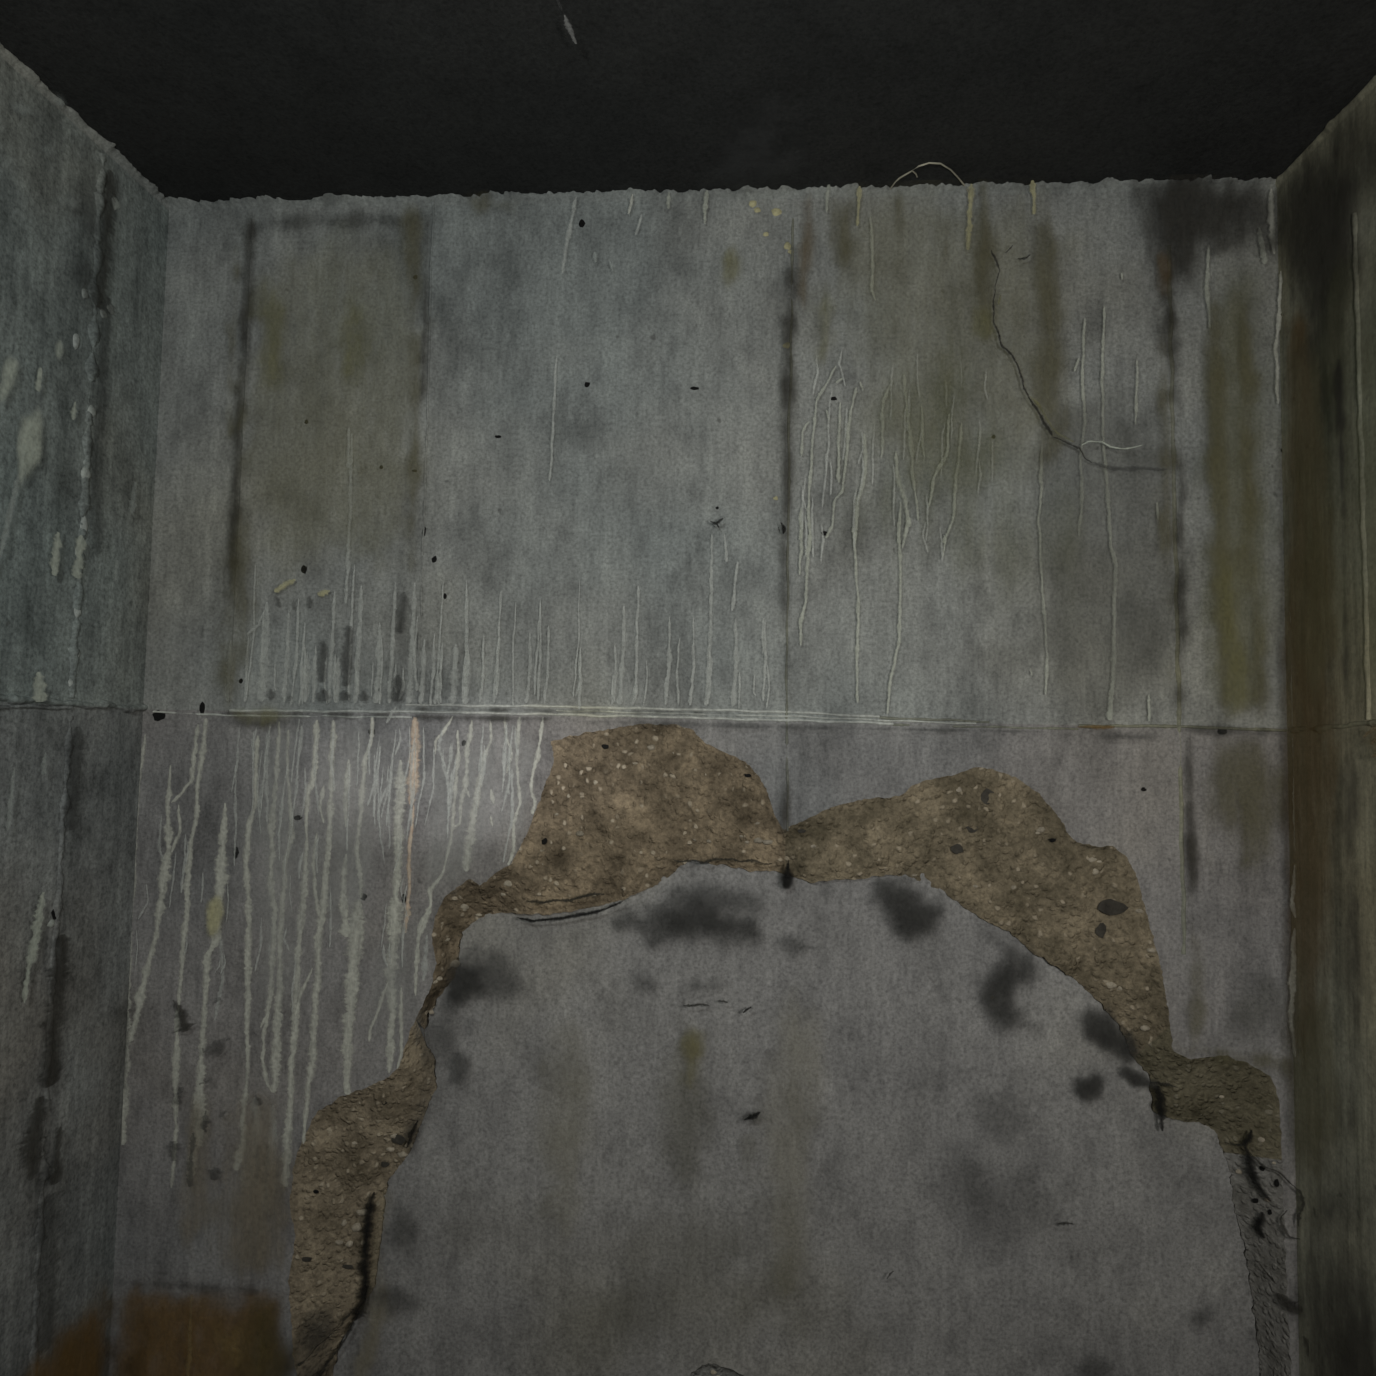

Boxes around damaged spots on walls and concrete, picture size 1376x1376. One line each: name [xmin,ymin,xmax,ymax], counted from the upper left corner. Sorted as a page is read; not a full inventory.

crack [991,245,1142,463]
damp [1150,159,1360,489]
damp [0,412,41,553]
damp [50,516,88,579]
damp [773,366,962,714]
damp [22,892,45,1003]
damp [121,707,544,1188]
spalling [288,723,1292,1376]
damp [878,881,941,940]
damp [983,957,1033,1025]
damp [1077,1076,1104,1101]
damp [1085,1011,1158,1087]